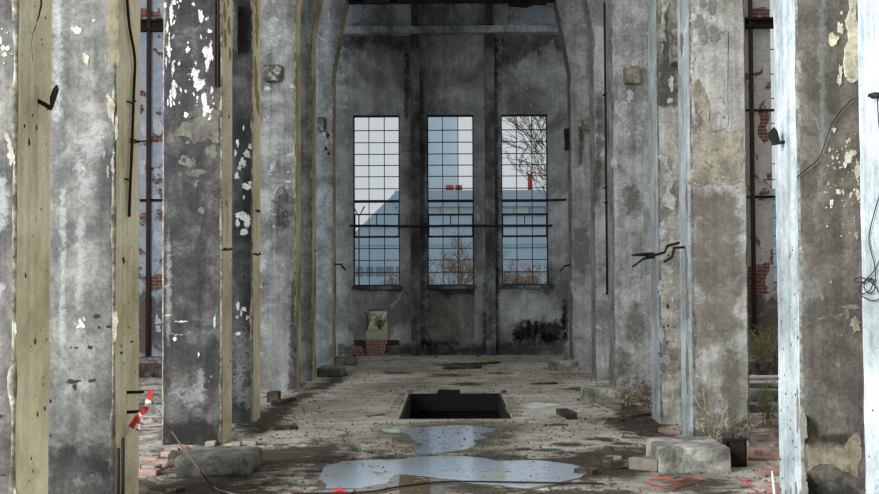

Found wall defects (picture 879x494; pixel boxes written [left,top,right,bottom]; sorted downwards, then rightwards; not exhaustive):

crack [31,0,42,59]
leakage [345,4,363,26]
peeling [828,0,858,85]
spalling [140,0,232,195]
peeling [140,160,163,211]
peeling [234,125,252,200]
peeling [236,211,251,235]
leakage [386,5,568,355]
spalling [632,0,747,396]
peeling [824,133,860,208]
spalling [748,240,770,298]
spalling [747,388,870,494]